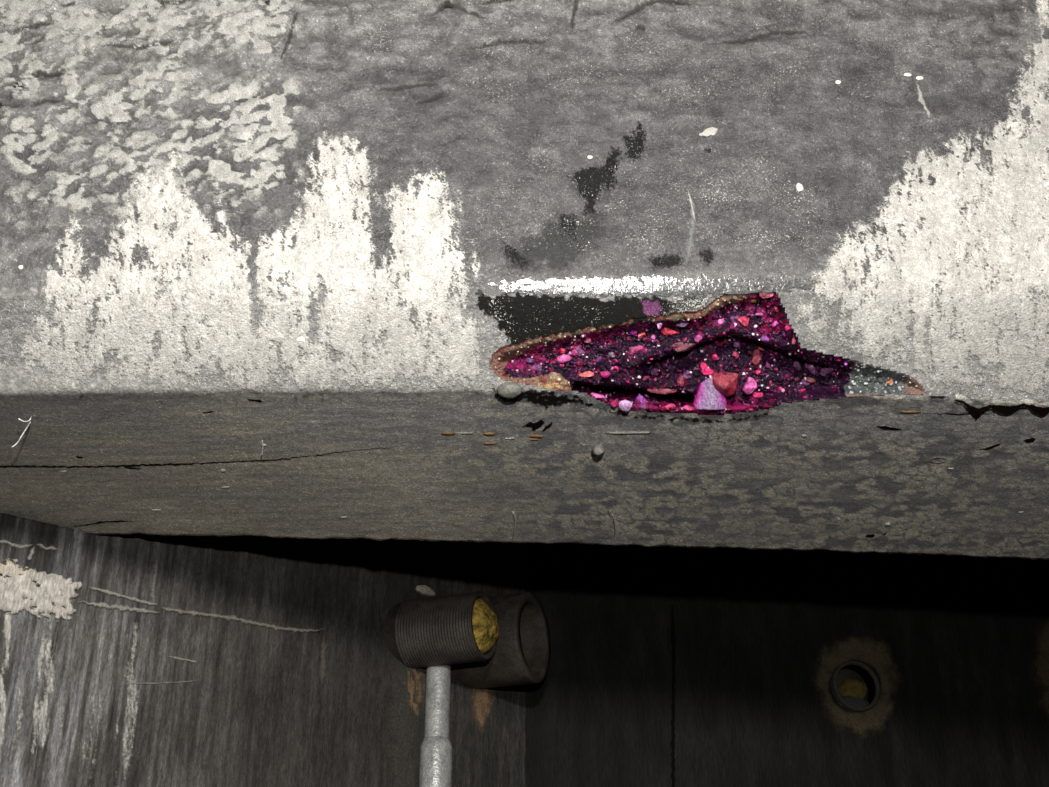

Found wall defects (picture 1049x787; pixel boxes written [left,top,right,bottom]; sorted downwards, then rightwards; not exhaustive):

water stain [0,0,1049,401]
crack [0,447,393,470]
spalling [489,286,928,416]
peeling [955,394,1049,409]